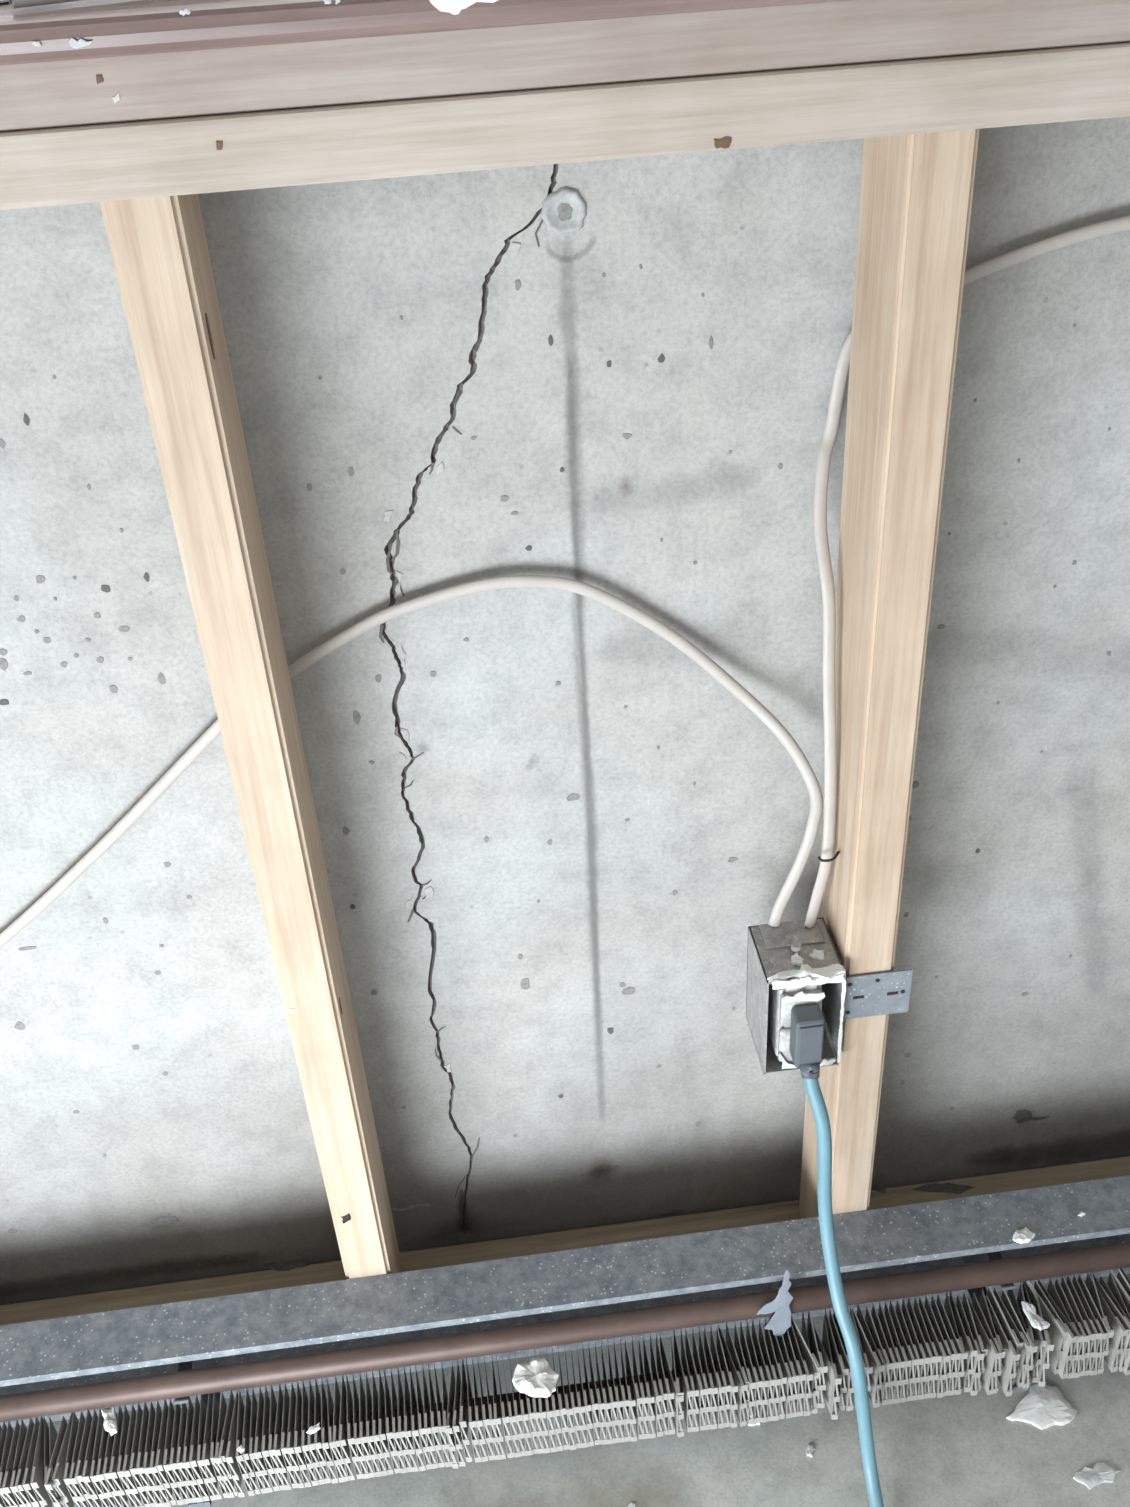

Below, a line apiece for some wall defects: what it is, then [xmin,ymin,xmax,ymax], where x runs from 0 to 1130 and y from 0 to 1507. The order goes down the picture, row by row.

crack [375,164,558,1244]